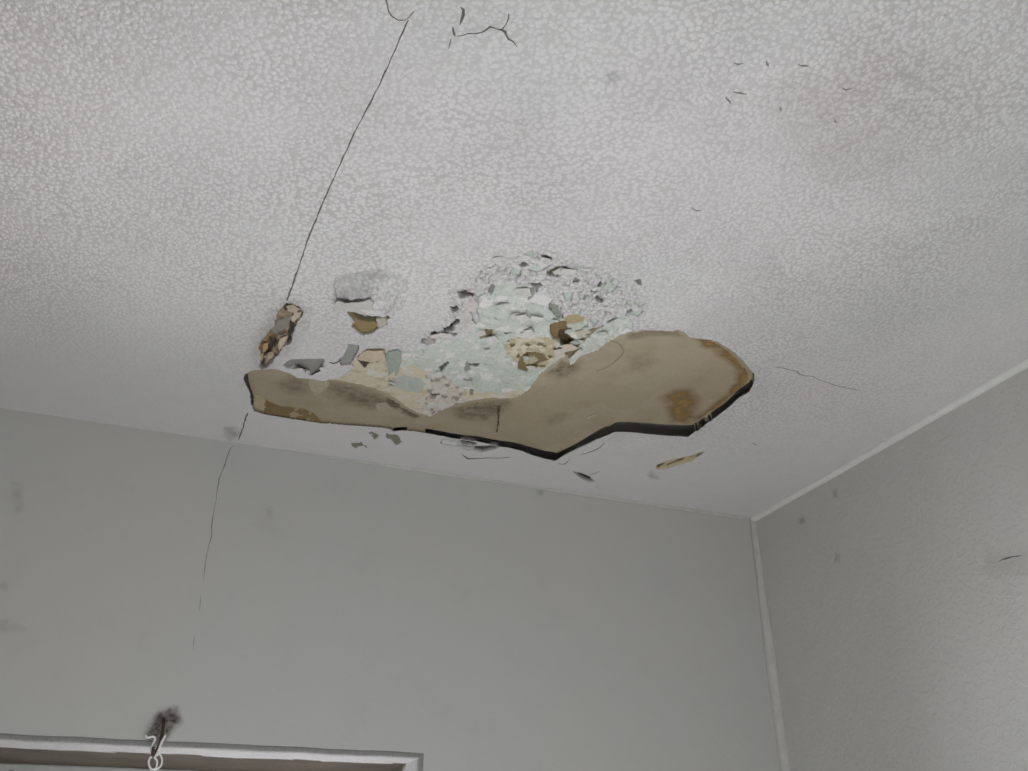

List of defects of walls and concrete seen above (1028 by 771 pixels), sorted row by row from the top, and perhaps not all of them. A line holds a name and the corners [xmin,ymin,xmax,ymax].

crack [448,7,517,49]
crack [285,0,414,305]
spalling [243,248,755,459]
crack [193,374,254,650]
spalling [655,451,704,470]